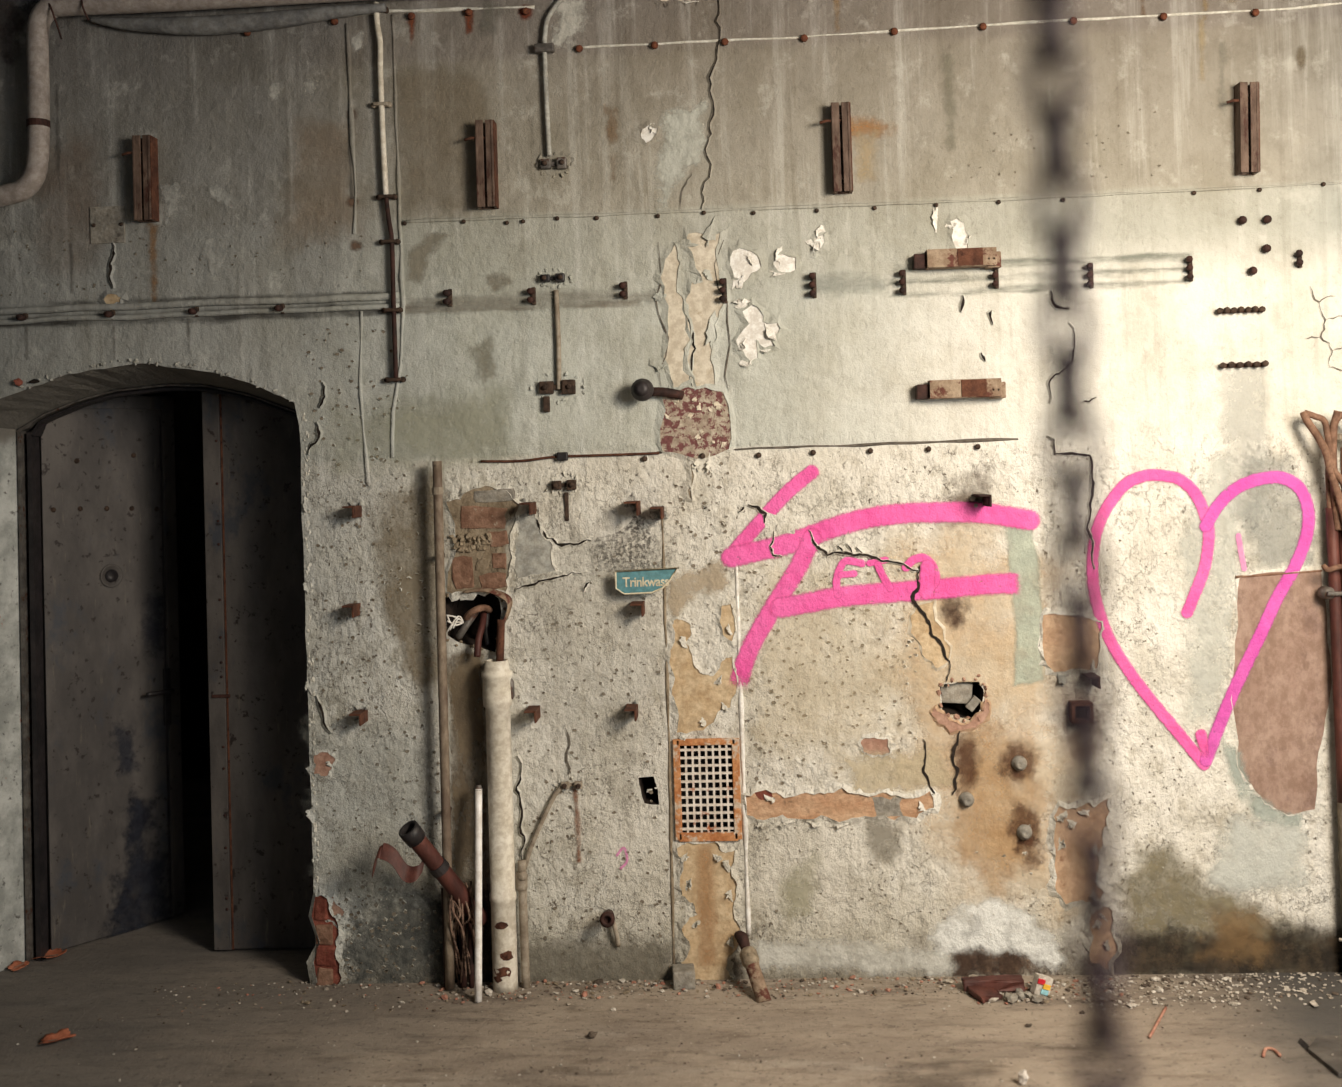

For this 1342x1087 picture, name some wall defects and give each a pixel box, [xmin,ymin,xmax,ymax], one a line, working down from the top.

crack [680,0,723,211]
peeling [14,371,71,389]
crack [656,240,731,391]
peeling [649,216,830,574]
crack [1307,287,1342,371]
spalling [90,328,440,986]
peeling [414,478,991,981]
crack [738,503,782,559]
crack [808,530,951,682]
crack [922,731,960,795]
peeling [1022,800,1078,916]
leakage [1120,850,1342,975]